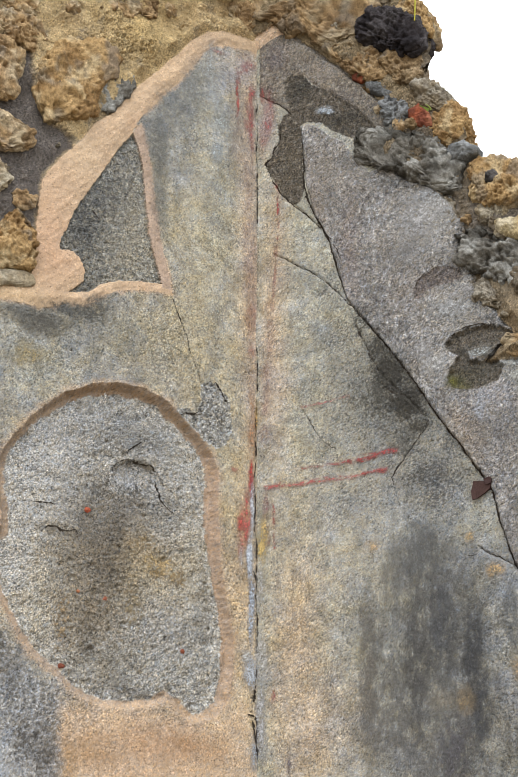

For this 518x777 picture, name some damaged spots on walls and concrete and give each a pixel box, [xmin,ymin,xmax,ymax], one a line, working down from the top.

flaking render [60,127,162,293]
flaking render [267,73,376,205]
crack [256,81,518,569]
flaking render [413,265,464,299]
crack [41,525,78,534]
flaking render [0,381,235,725]
crack [109,442,174,514]
crack [245,349,259,760]
damp [361,529,497,777]